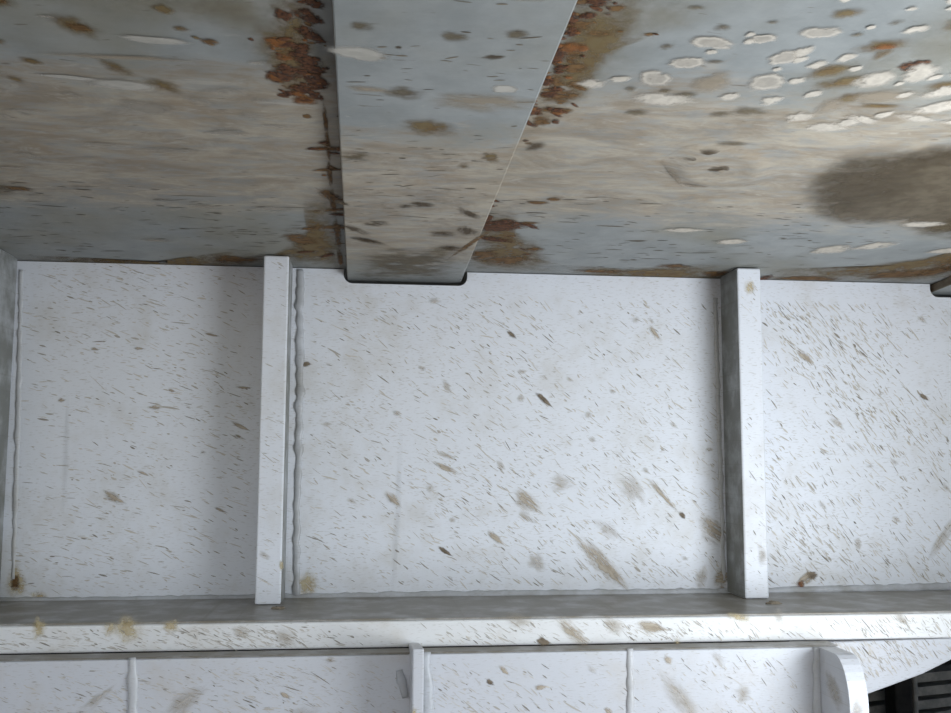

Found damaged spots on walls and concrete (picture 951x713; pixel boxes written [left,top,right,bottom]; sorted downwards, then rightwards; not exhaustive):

corrosion [526,0,628,127]
corrosion [248,0,381,265]
damp [816,151,951,232]
corrosion [372,200,542,276]
damp [811,242,895,254]